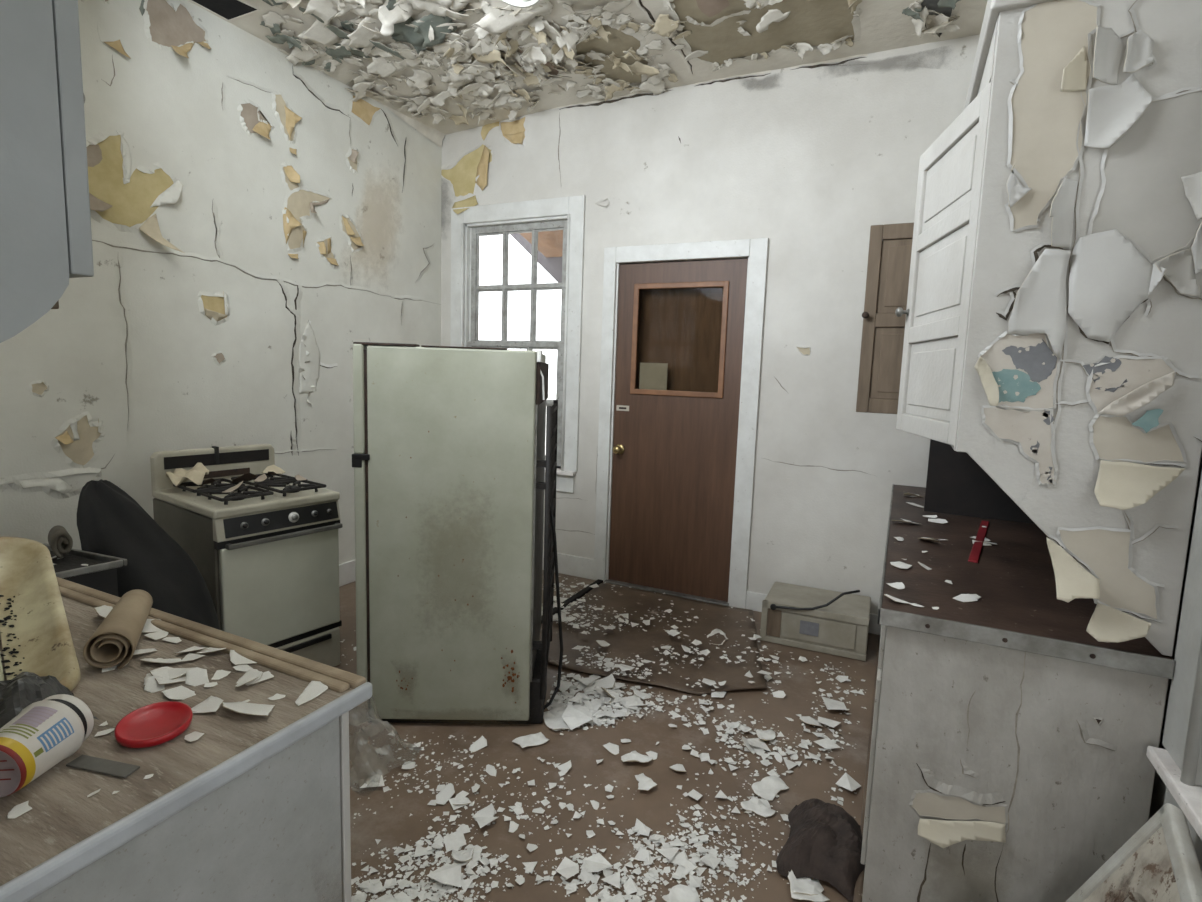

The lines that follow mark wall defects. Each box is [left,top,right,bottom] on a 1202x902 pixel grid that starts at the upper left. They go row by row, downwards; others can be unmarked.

peeling [86,129,184,253]
peeling [139,0,211,58]
crack [92,199,441,469]
peeling [237,91,364,270]
peeling [260,0,865,214]
crack [558,0,868,182]
peeling [902,0,961,38]
peeling [974,0,1202,510]
peeling [0,411,106,499]
peeling [1046,526,1160,643]
peeling [909,789,1009,848]
crack [916,652,1026,902]